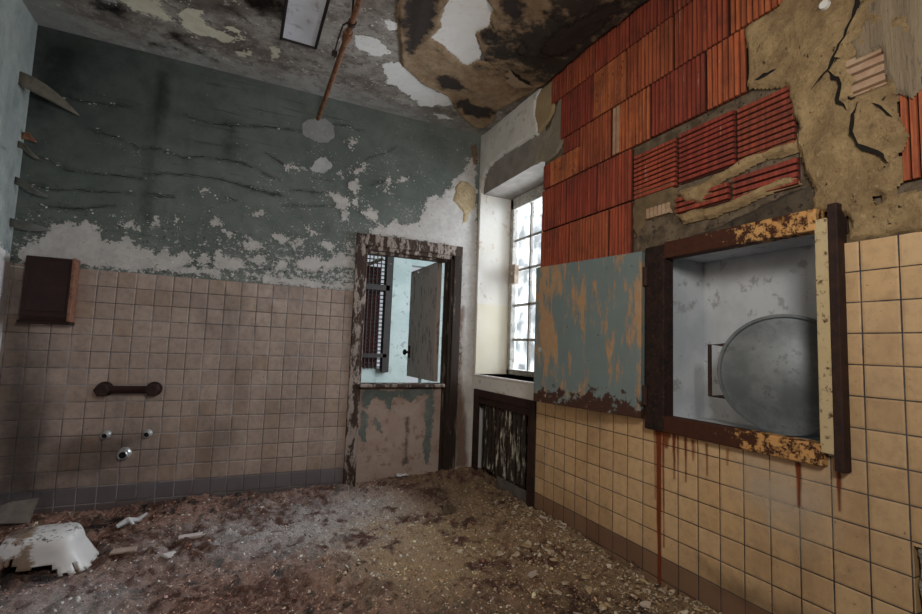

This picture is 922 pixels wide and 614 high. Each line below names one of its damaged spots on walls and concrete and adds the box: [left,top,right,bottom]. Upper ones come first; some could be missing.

peeling [18,71,79,116]
peeling [106,0,252,58]
peeling [269,44,281,61]
crack [811,0,893,163]
crack [31,128,330,211]
peeling [0,176,356,291]
spalling [283,0,922,469]
corrosion [654,430,694,583]